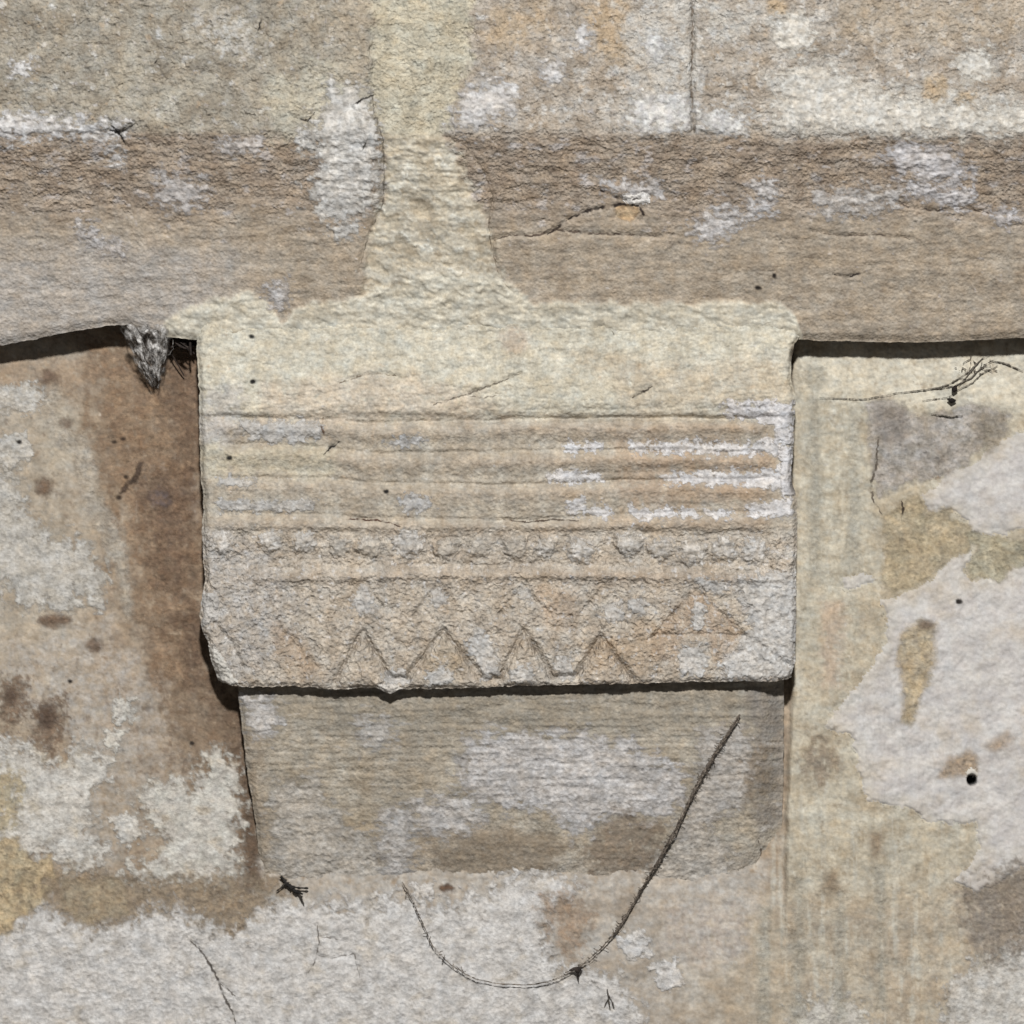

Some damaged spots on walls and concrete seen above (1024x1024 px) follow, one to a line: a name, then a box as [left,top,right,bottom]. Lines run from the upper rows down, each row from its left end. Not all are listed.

crack [467,147,654,263]
crack [870,439,882,514]
leakage [0,333,324,936]
crack [191,941,236,1022]